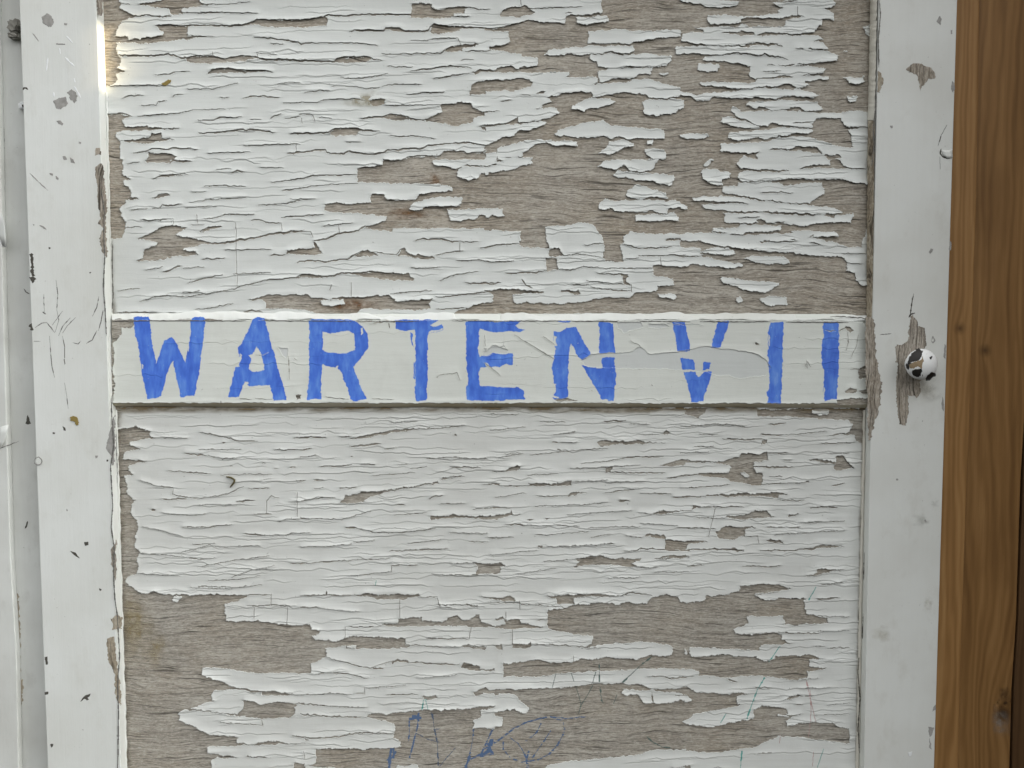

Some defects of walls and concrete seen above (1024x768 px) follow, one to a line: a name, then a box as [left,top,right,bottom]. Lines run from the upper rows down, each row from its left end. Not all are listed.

peeling [95,0,884,443]
peeling [895,314,946,426]
spalling [906,63,936,90]
peeling [95,416,854,768]